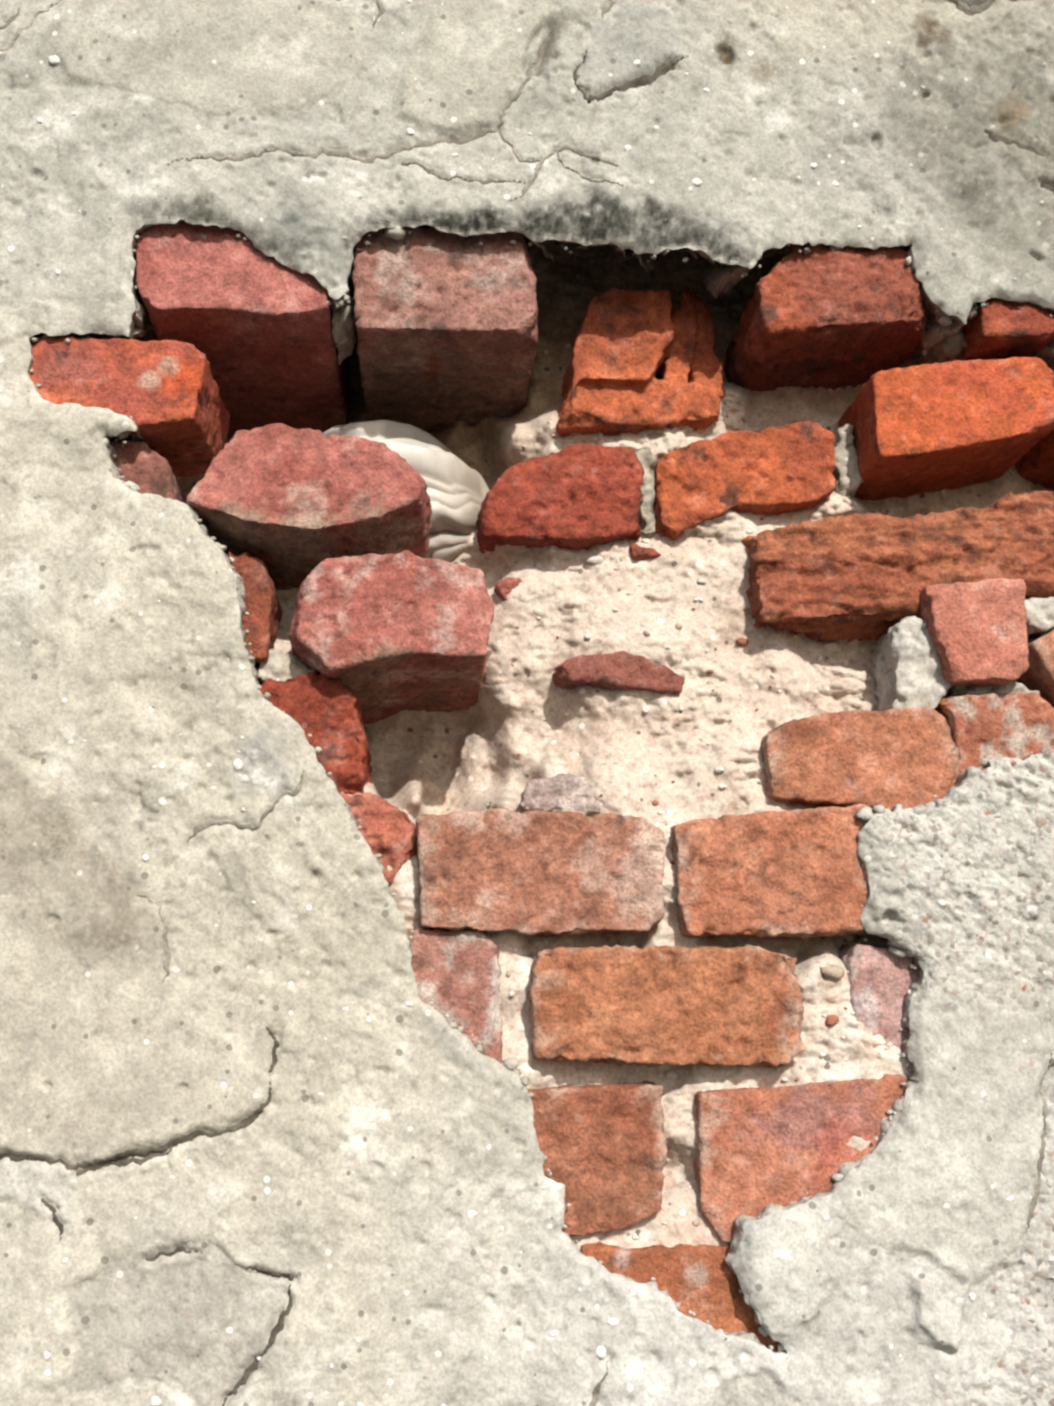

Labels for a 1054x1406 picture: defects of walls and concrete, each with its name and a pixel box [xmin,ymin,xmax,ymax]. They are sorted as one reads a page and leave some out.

crack [167,22,627,201]
crack [573,50,685,104]
crack [948,0,1017,16]
spalling [28,219,207,399]
spalling [324,224,435,423]
spalling [175,474,315,713]
spalling [364,231,1054,1298]
peeling [0,749,259,1233]
crack [0,1027,279,1176]
crack [41,1198,64,1242]
spalling [69,1241,287,1406]
crack [222,1266,294,1406]